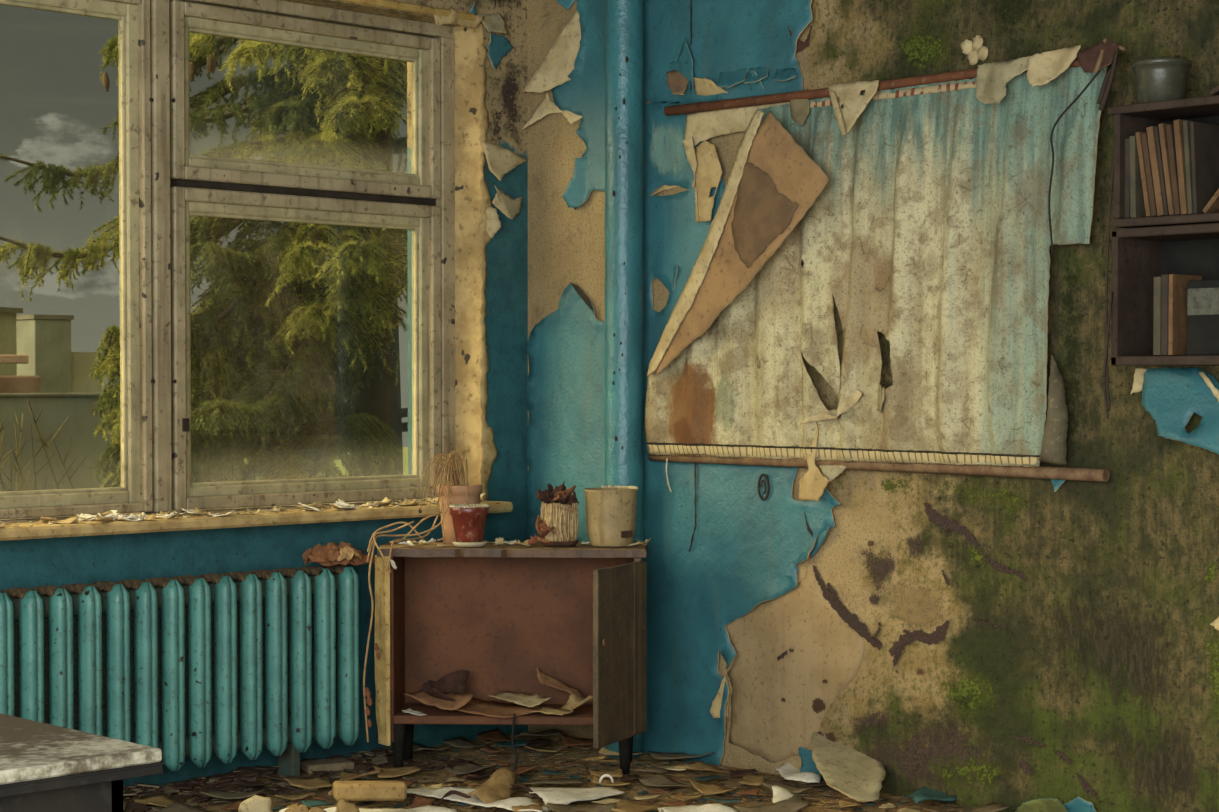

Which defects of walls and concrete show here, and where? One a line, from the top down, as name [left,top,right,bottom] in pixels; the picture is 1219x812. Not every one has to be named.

peeling [961,35,988,65]
peeling [521,0,628,210]
peeling [482,141,527,238]
peeling [643,0,866,780]
crack [923,503,1026,586]
crack [813,565,1000,673]
damp [1045,601,1168,709]
damp [812,698,825,714]
damp [849,712,998,793]